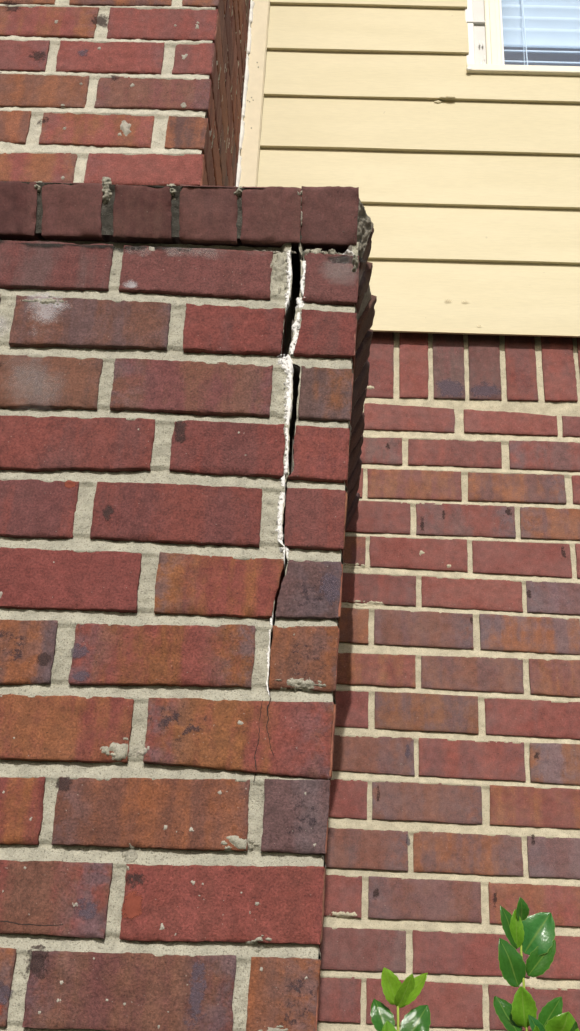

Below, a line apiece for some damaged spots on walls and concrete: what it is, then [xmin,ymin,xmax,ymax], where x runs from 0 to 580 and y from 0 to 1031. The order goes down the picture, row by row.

crack [275,250,306,575]
crack [253,610,276,782]